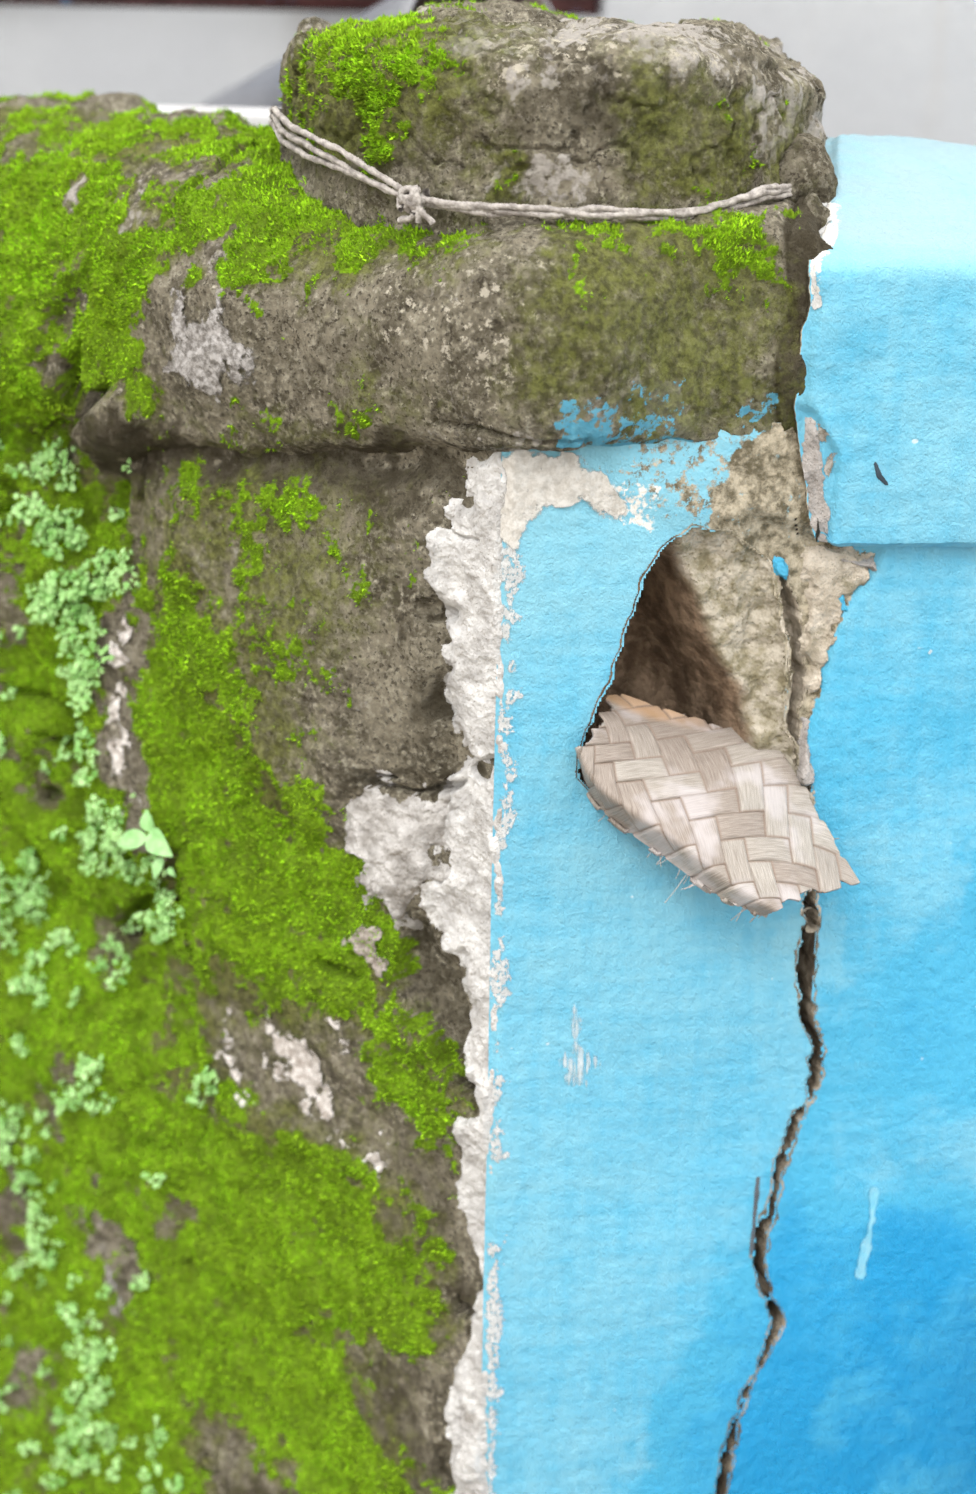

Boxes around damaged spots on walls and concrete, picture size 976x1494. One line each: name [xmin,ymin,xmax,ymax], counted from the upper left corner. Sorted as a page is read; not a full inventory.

crack [776,574,816,808]
spalling [796,717,815,786]
spalling [772,417,877,694]
spalling [342,449,627,1494]
crack [714,889,827,1494]